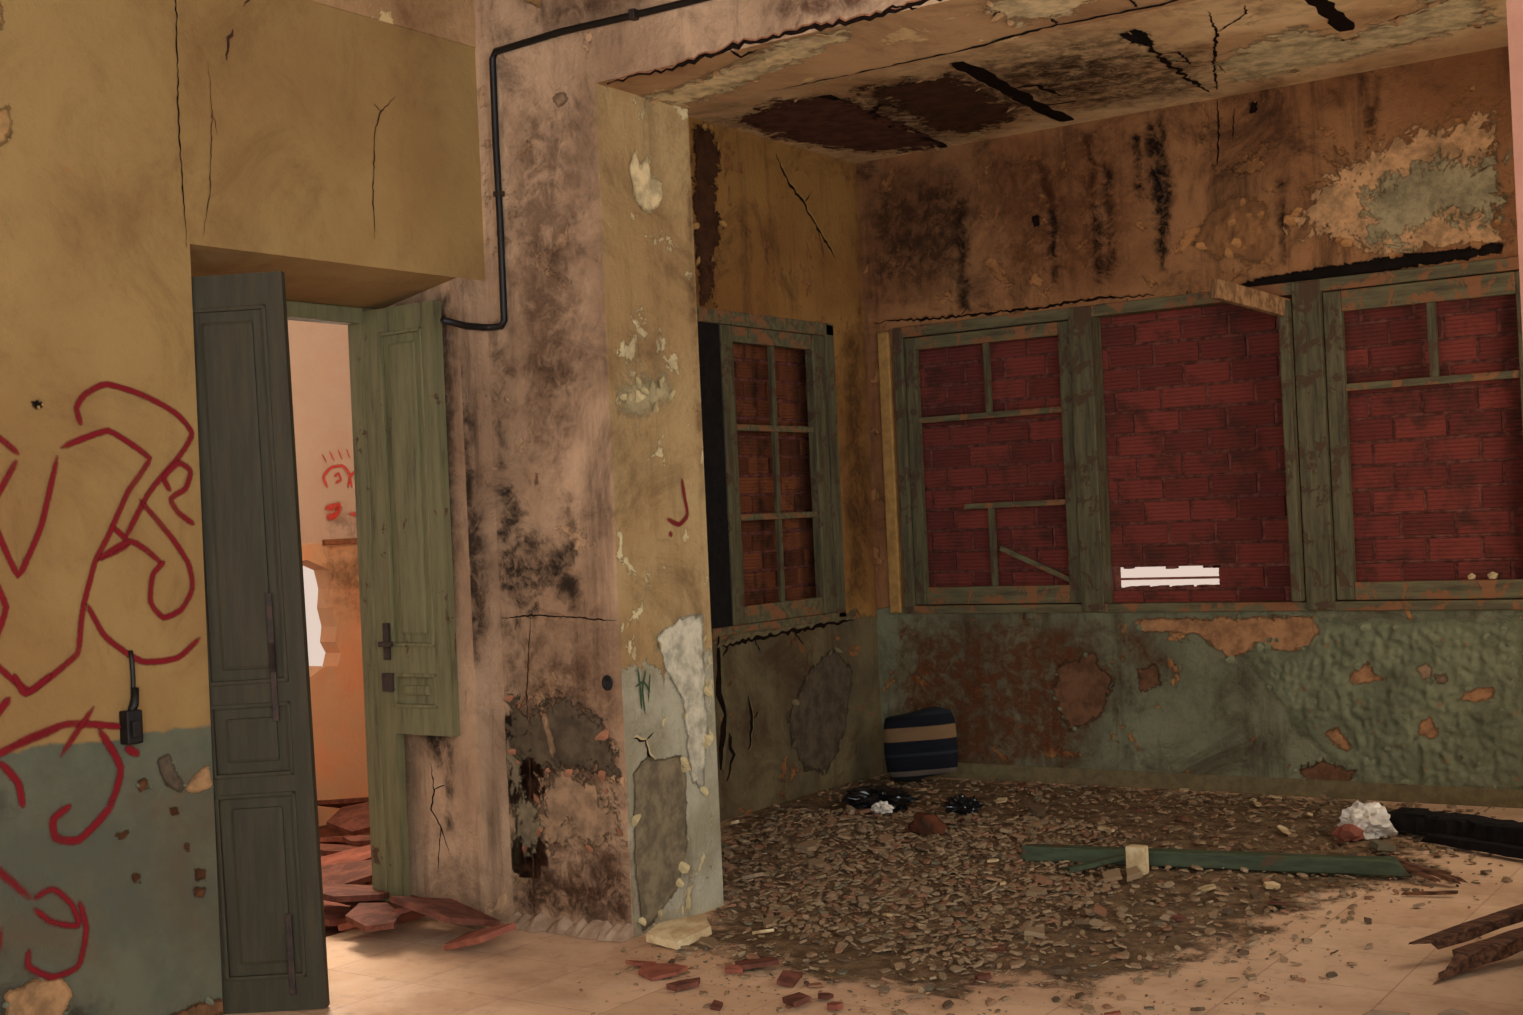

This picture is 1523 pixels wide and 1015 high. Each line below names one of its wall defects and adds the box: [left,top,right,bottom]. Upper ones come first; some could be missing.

crack [175,0,249,246]
crack [607,0,942,84]
flaking render [690,71,1035,308]
water stain [872,185,968,307]
crack [775,0,1248,165]
water stain [948,39,1195,114]
water stain [1133,122,1173,268]
crack [1305,0,1355,41]
peeling [1239,104,1517,292]
peeling [1135,614,1320,663]
peeling [503,612,714,932]
peeling [2,977,73,1015]